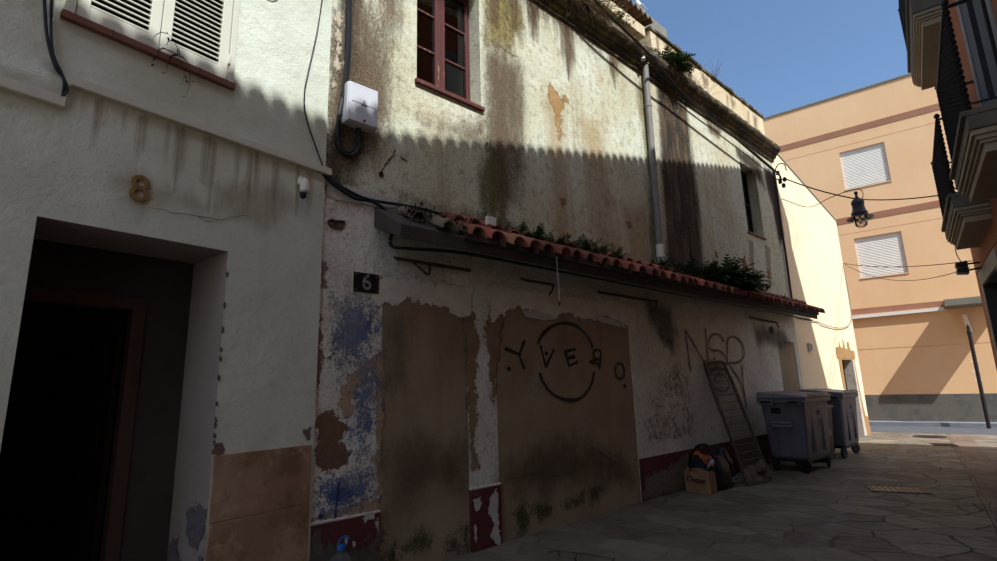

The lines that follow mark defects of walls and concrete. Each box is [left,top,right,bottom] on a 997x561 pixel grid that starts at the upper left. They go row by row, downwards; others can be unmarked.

flaking render [329,9,345,88]
water stain [511,0,539,40]
water stain [326,0,403,185]
water stain [439,49,527,208]
flaking render [547,82,570,141]
water stain [657,86,705,269]
spalling [212,401,225,455]
peeling [303,261,639,561]
peeling [167,500,207,561]